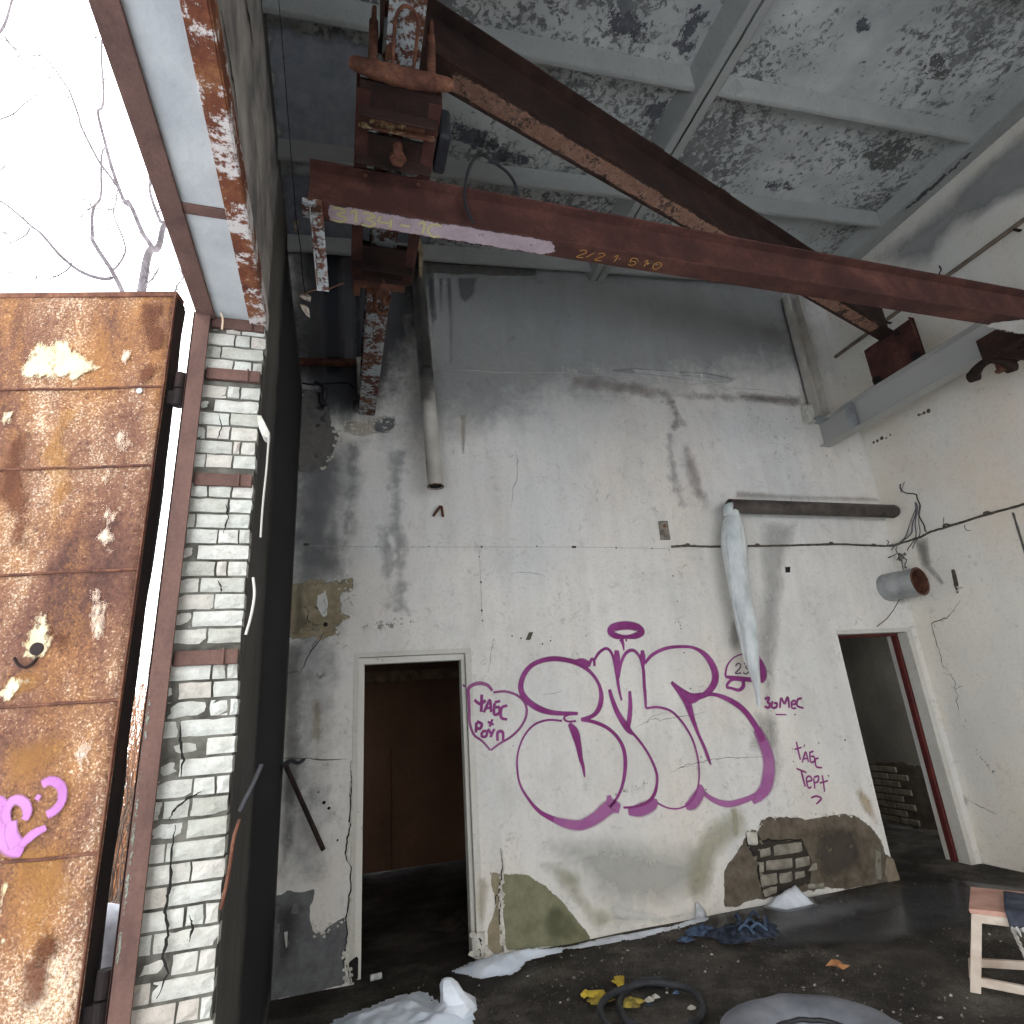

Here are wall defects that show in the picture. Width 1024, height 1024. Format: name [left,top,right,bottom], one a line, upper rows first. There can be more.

peeling [607,10,649,44]
peeling [671,4,709,57]
peeling [860,136,922,173]
flaking render [298,389,396,472]
damp [297,460,341,585]
peeling [290,578,358,648]
crack [931,603,961,717]
crack [156,721,200,999]
flaking render [271,889,347,1001]
crack [286,757,358,984]
crack [494,849,505,950]
flaking render [724,762,938,907]